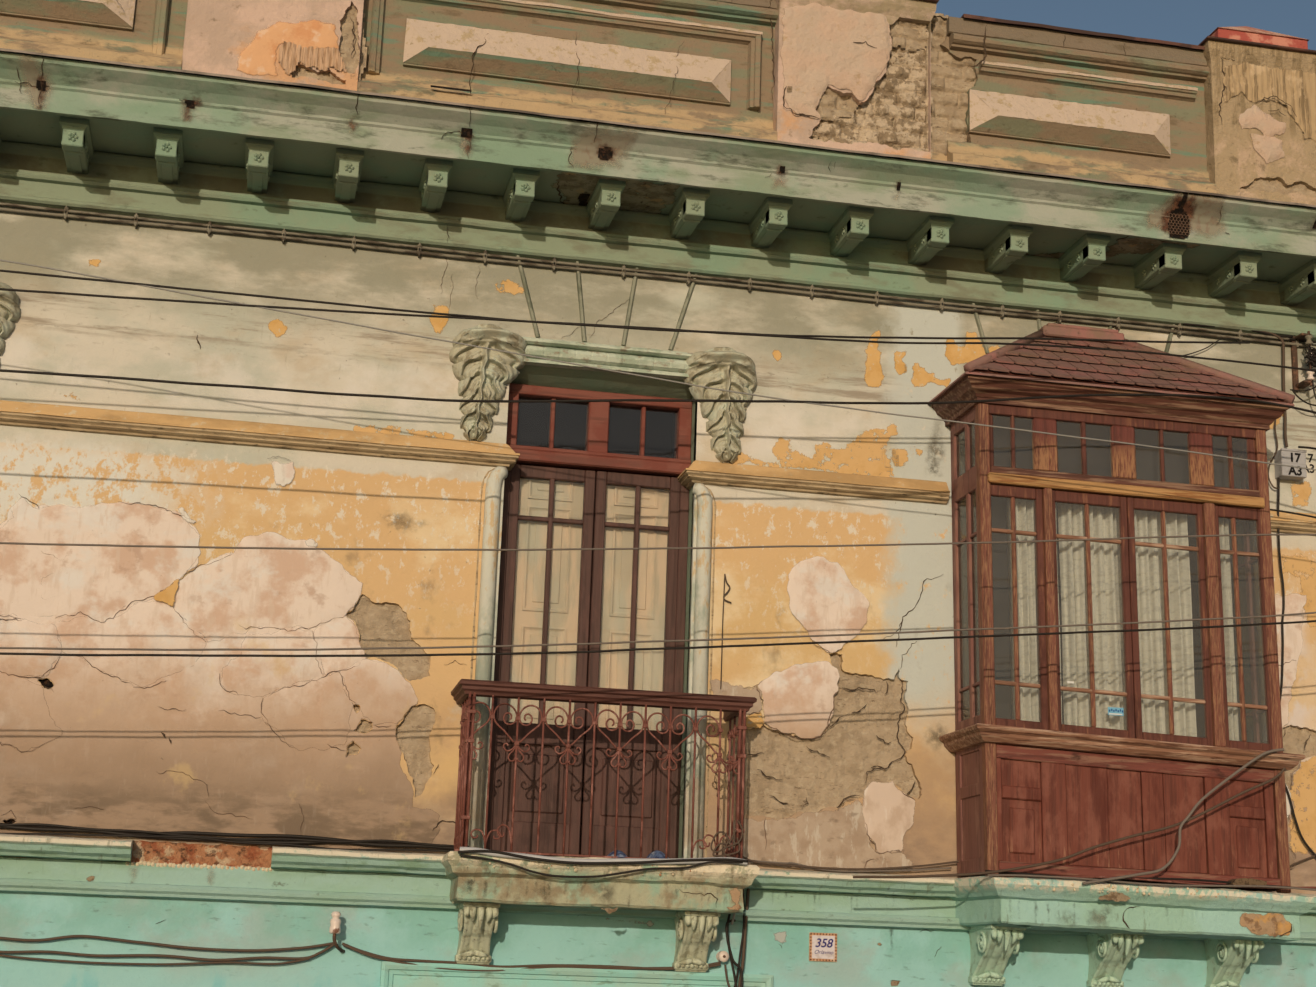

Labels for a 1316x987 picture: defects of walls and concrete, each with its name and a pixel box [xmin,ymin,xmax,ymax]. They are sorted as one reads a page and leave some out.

peeling [237,20,347,76]
peeling [780,2,892,119]
flaking render [1223,62,1316,164]
flaking render [552,172,680,214]
peeling [729,424,923,477]
peeling [0,497,440,872]
peeling [710,556,869,738]
crack [886,576,940,667]
peeling [1275,554,1316,727]
peeling [727,781,915,910]
peeling [1286,756,1316,869]
flaking render [1096,878,1292,937]